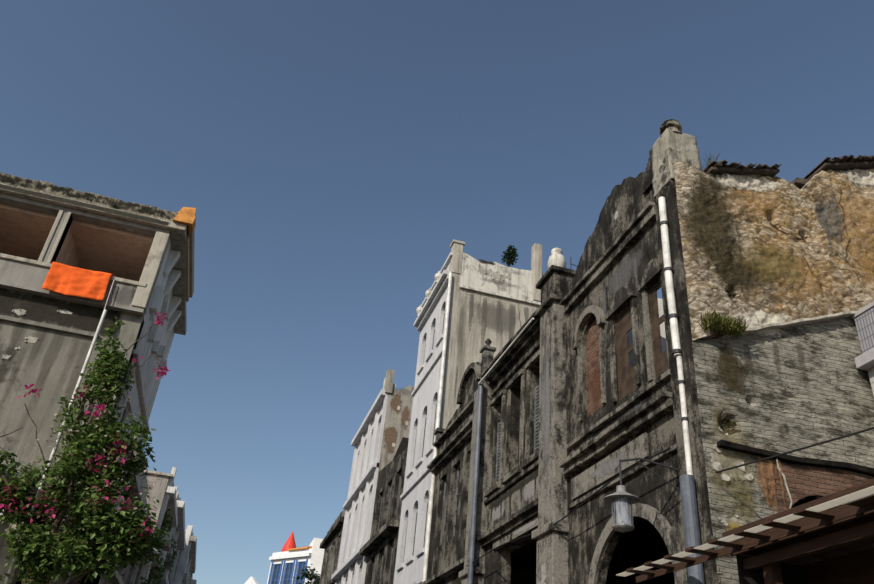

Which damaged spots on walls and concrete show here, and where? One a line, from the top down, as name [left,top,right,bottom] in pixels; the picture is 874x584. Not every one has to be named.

leakage [0,288,136,336]
leakage [469,295,528,339]
spalling [384,394,410,453]
spalling [718,411,742,436]
spalling [710,444,754,483]